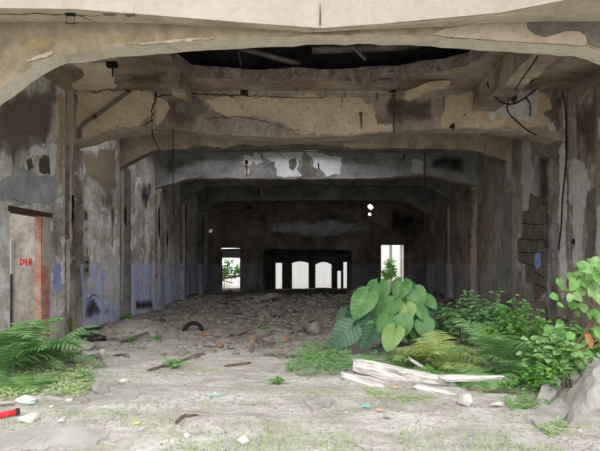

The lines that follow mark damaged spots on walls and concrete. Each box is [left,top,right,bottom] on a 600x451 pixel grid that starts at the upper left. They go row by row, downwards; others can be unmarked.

peeling [300,8,600,48]
water stain [0,84,55,162]
crack [206,116,330,135]
crack [192,92,396,100]
peeling [404,81,567,131]
peeling [188,144,349,178]
water stain [433,156,462,171]
peeling [0,62,170,316]
spalling [517,140,548,301]
peeling [557,142,600,300]